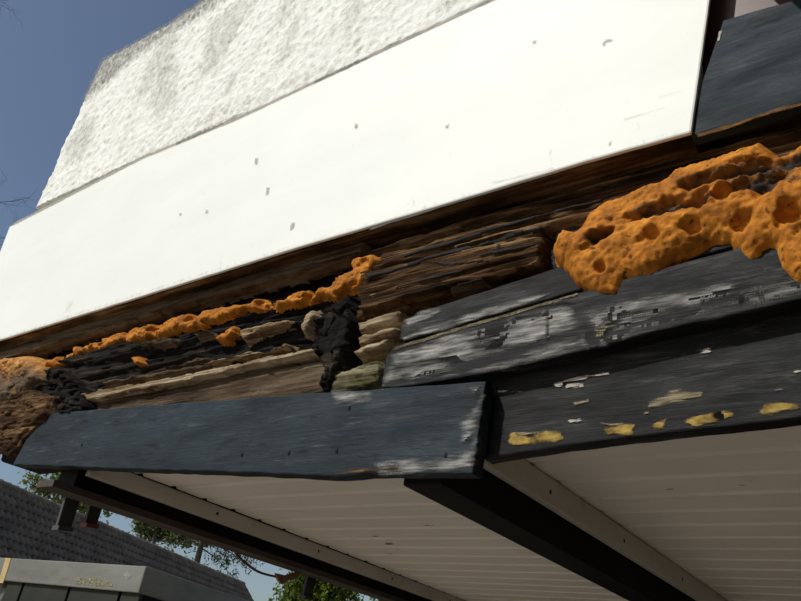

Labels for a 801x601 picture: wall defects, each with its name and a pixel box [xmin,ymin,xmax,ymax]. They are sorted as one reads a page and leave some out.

peeling [554,372,608,388]
peeling [644,389,702,414]